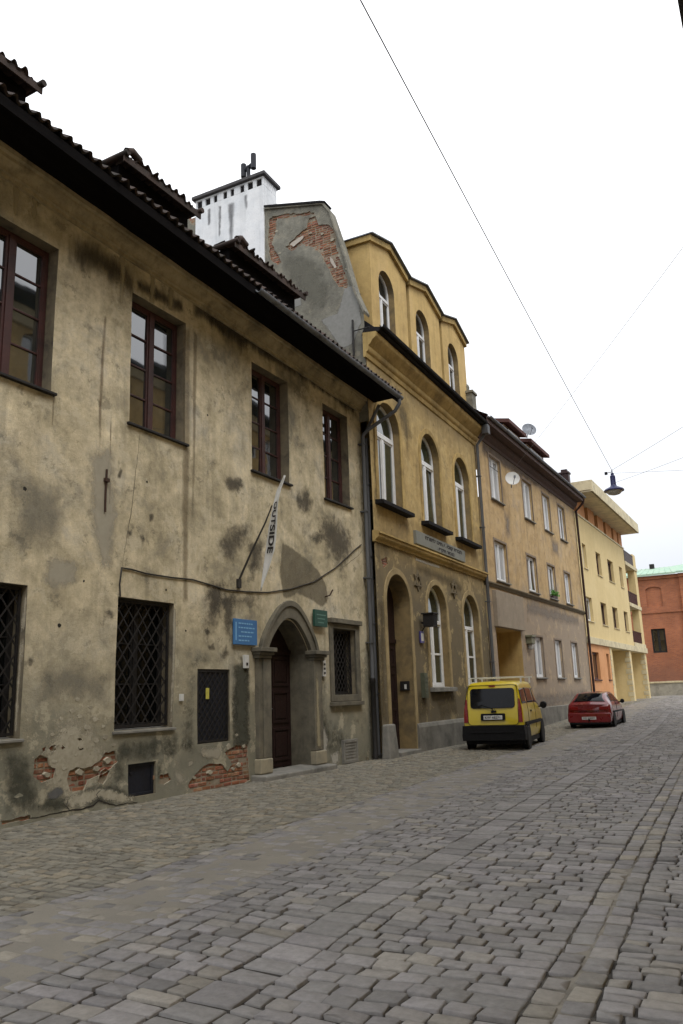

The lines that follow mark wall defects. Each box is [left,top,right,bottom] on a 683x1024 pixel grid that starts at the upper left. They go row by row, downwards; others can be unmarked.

flaking render [268,212,348,288]
peeling [33,697,134,808]
flaking render [153,733,249,793]